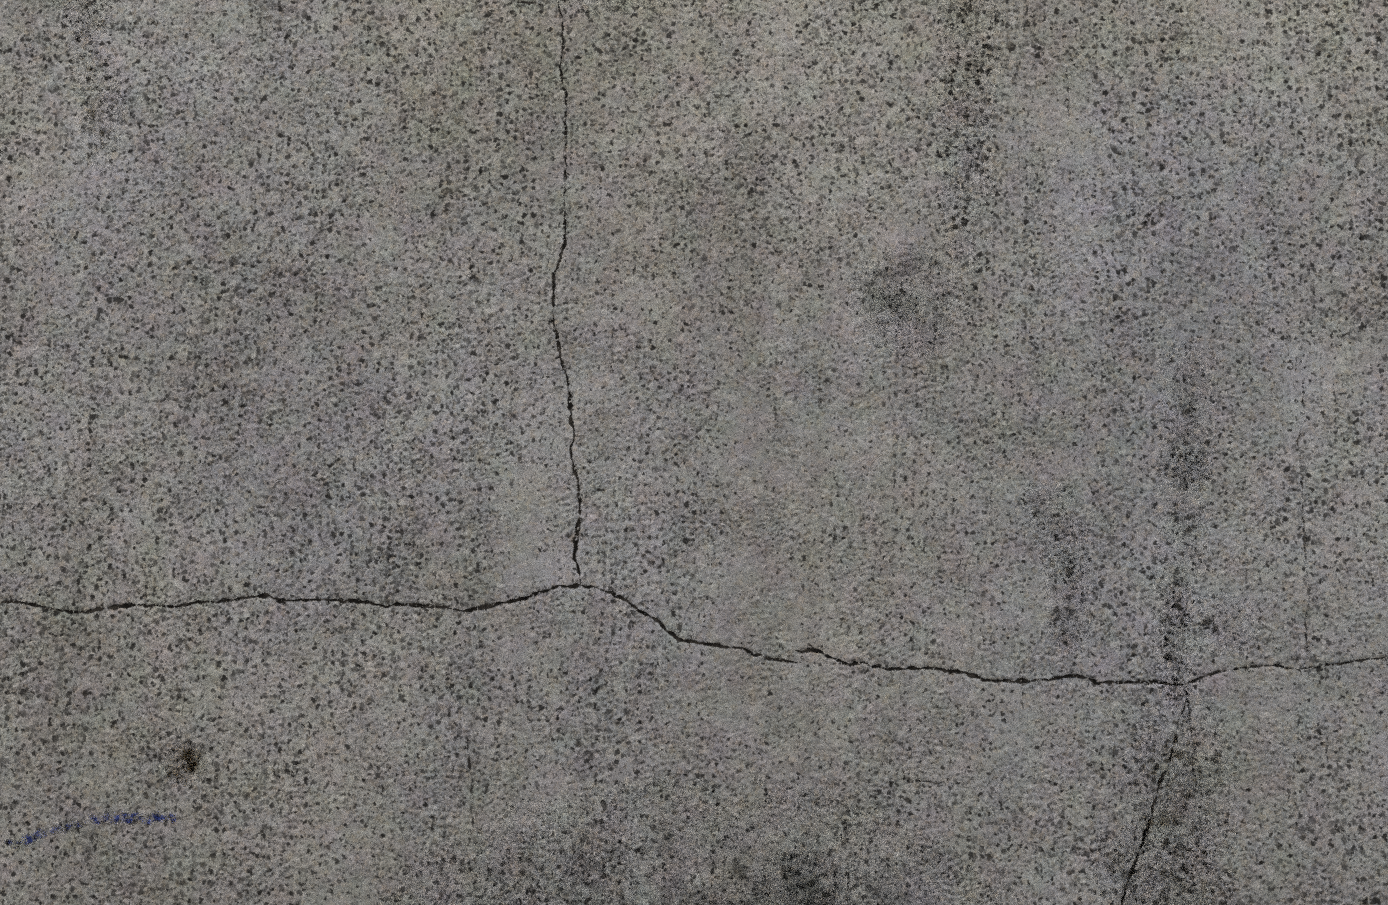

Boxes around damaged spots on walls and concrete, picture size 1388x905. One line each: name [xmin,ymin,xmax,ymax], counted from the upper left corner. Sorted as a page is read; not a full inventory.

crack [1,1,798,663]
crack [1296,432,1308,576]
crack [796,648,1388,733]
crack [466,738,474,826]
crack [1121,723,1179,905]